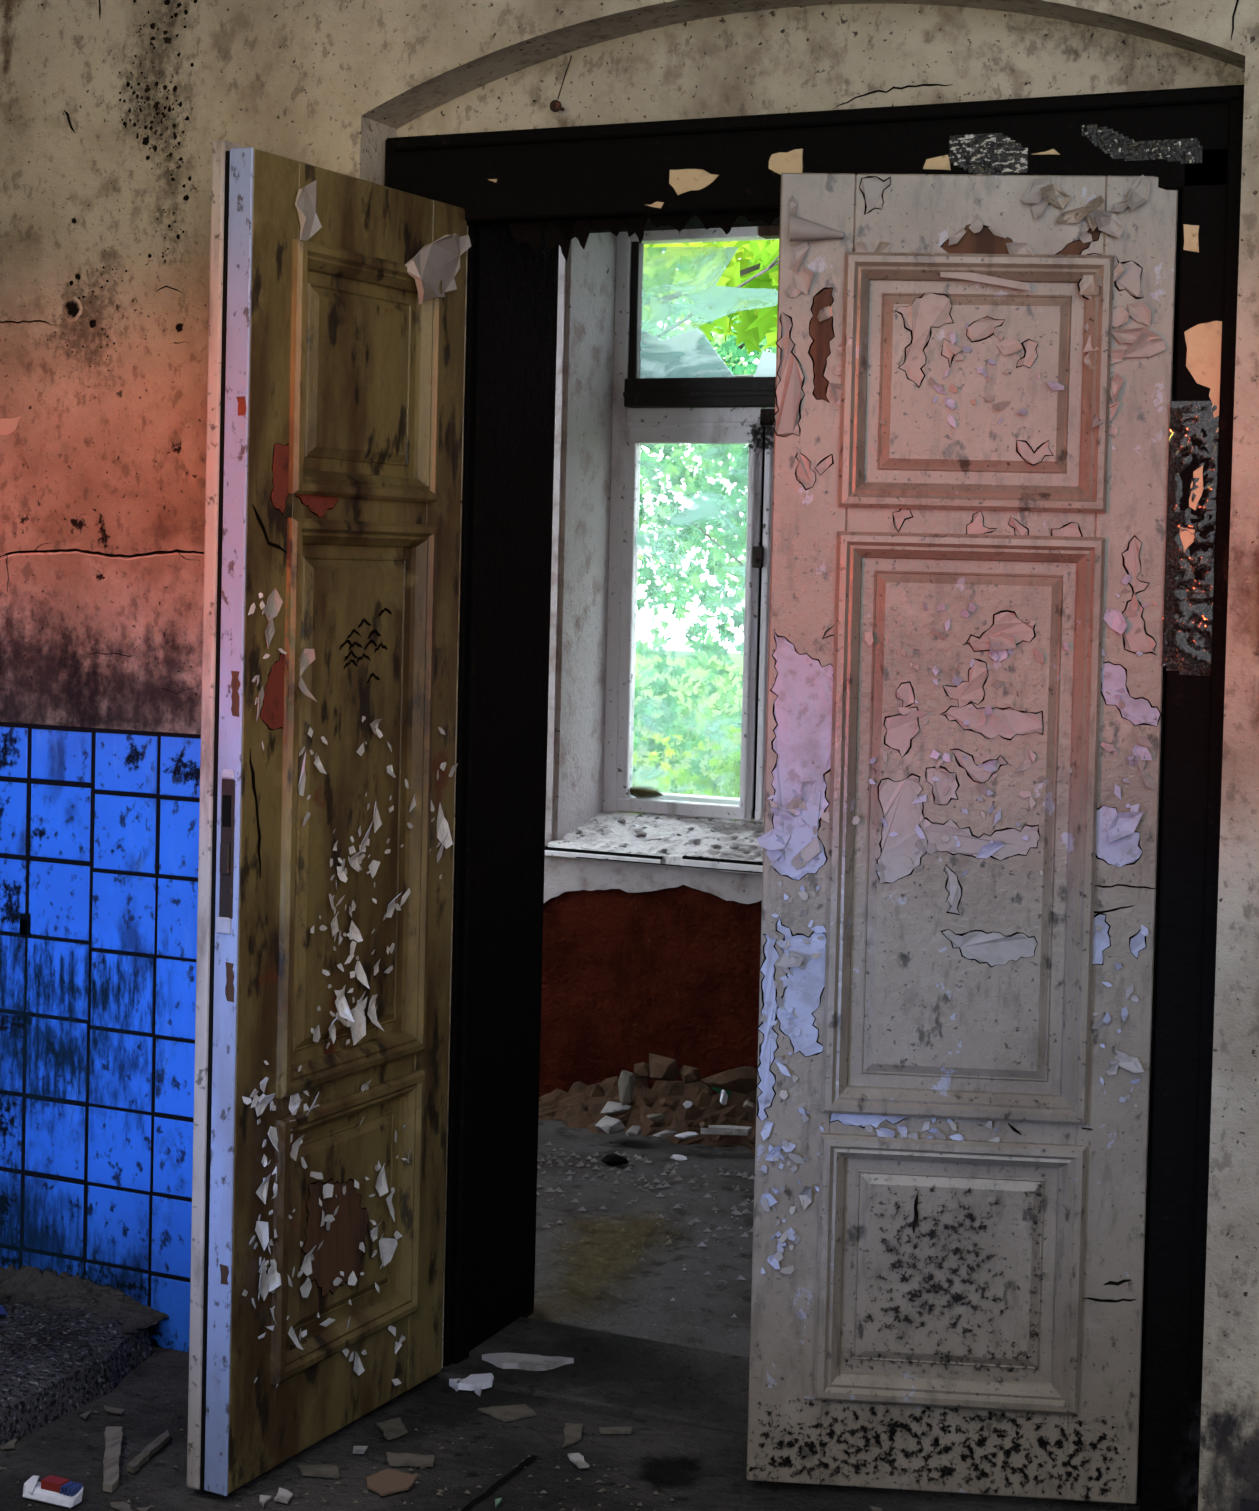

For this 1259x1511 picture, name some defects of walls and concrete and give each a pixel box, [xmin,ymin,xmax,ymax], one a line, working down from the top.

leakage [119,0,198,201]
peeling [647,169,719,208]
peeling [769,149,803,175]
peeling [923,155,951,170]
crack [0,543,204,592]
leakage [0,733,20,840]
leakage [114,743,143,771]
leakage [163,754,200,788]
peeling [869,603,1046,968]
leakage [0,828,49,937]
spalling [539,631,964,1274]
crack [460,1455,538,1511]